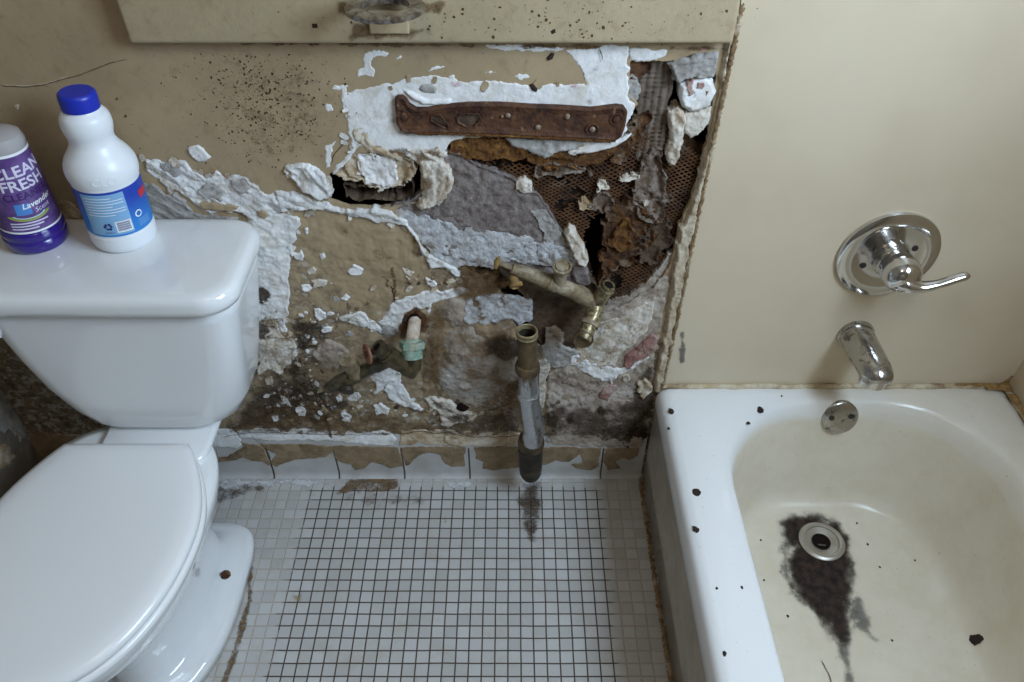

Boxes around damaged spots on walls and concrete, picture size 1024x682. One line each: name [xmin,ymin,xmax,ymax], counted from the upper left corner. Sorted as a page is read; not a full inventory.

mould [161,53,357,169]
rust [448,109,653,171]
spalling [663,51,719,166]
peeling [139,44,674,471]
rust [596,191,661,290]
damp [229,310,522,435]
damp [543,356,656,448]
damp [339,479,397,493]
damp [518,485,540,541]